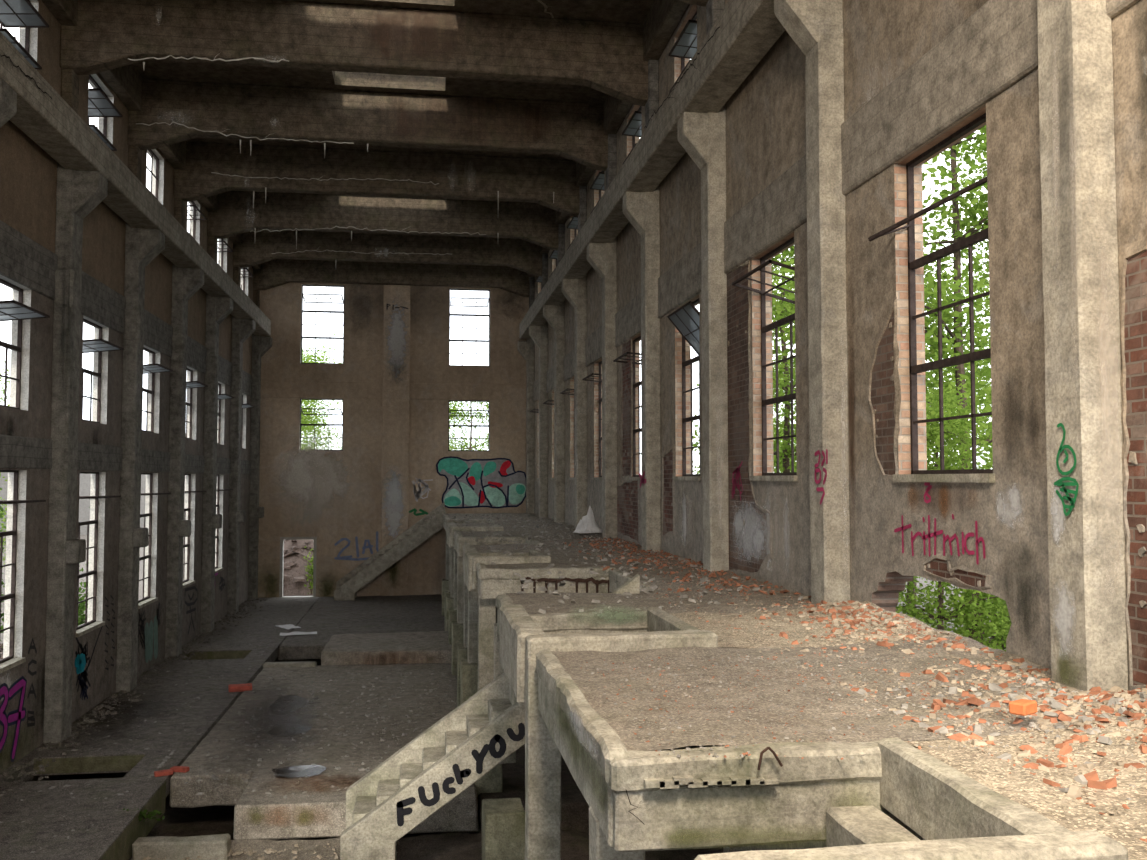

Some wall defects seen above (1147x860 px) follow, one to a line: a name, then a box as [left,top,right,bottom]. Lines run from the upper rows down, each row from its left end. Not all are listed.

flaking render [867,297,901,485]
flaking render [1120,236,1147,691]
flaking render [922,553,994,591]